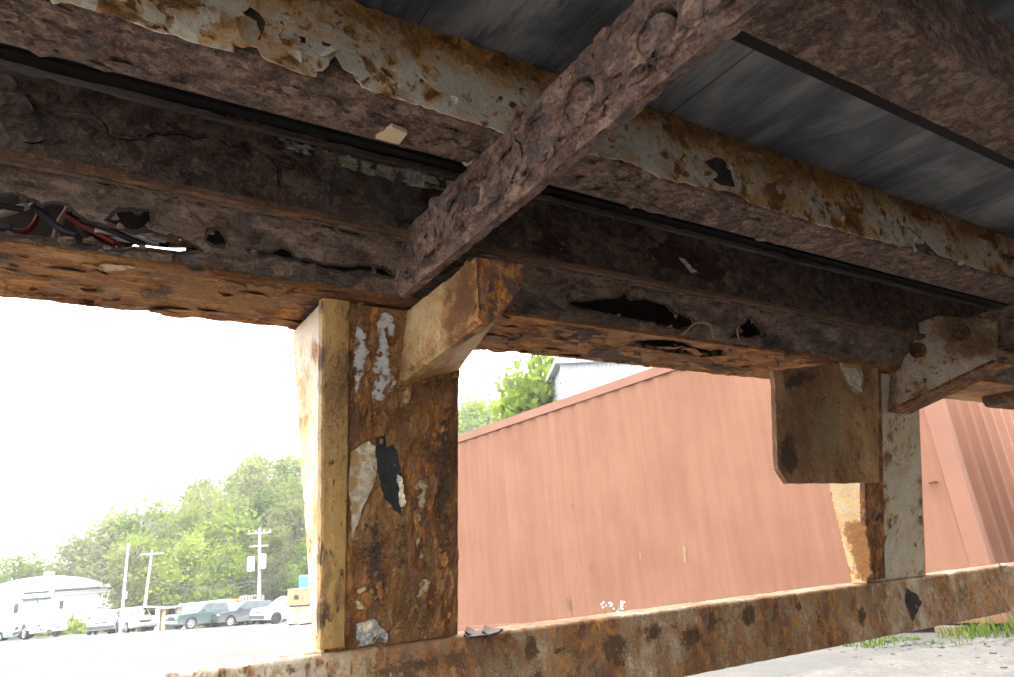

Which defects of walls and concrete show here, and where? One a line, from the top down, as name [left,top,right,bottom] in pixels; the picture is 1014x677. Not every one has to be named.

peeling [235,7,265,46]
rust [294,297,323,325]
peeling [352,324,369,409]
peeling [348,441,377,535]
peeling [397,474,406,507]
rust [394,372,456,570]
rust [362,522,405,612]
peeling [360,621,373,633]
rust [741,603,756,627]
rust [905,588,922,622]
rust [369,625,503,677]
rust [524,635,542,677]